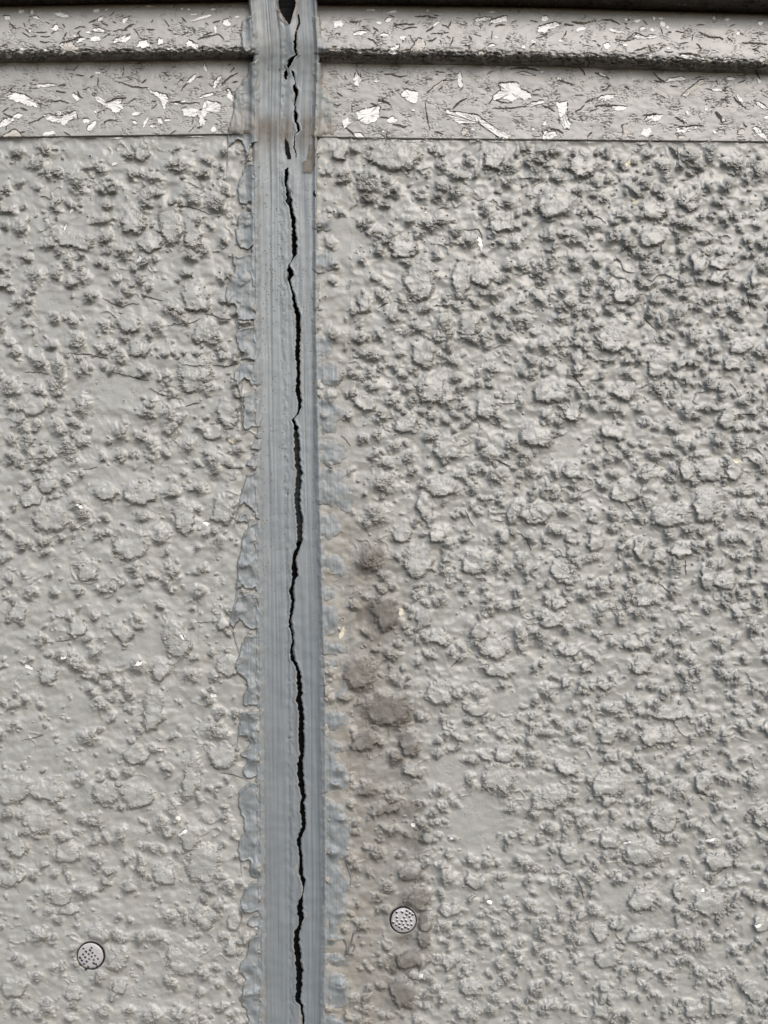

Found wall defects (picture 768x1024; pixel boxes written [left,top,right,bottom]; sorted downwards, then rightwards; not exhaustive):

peeling [0,8,239,139]
peeling [333,9,517,57]
peeling [333,66,629,143]
peeling [515,15,768,144]
crack [284,14,316,1024]